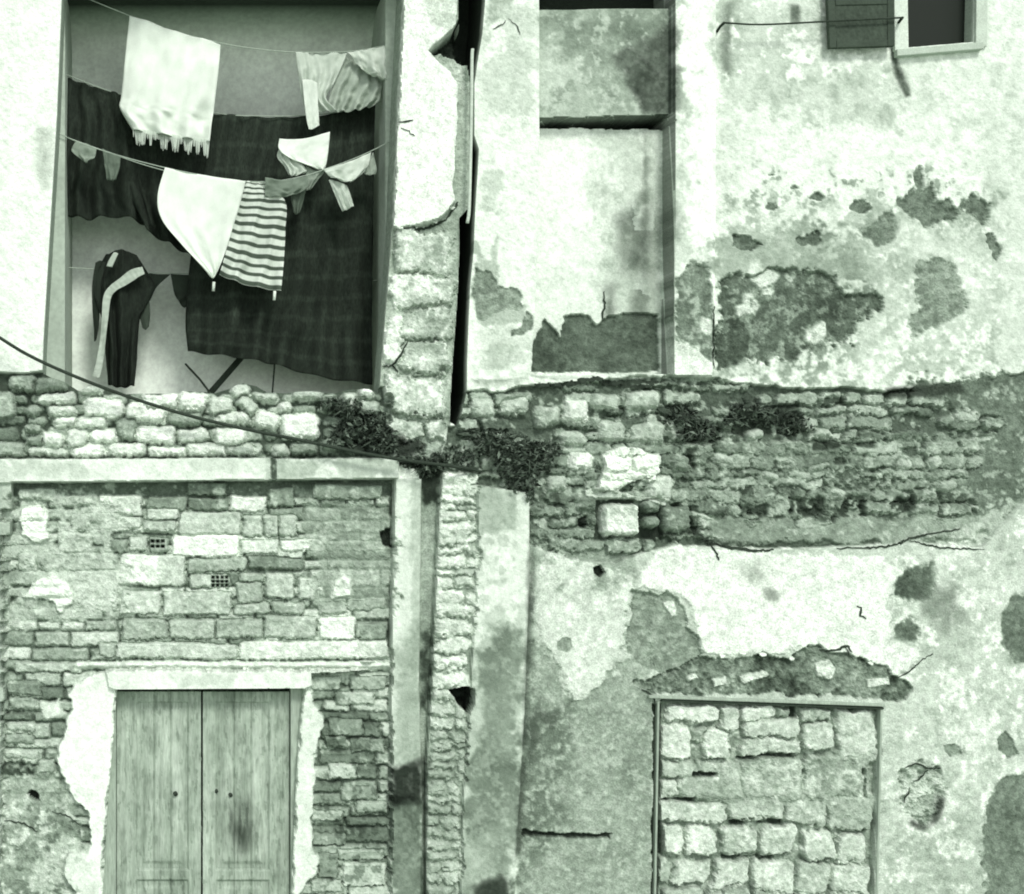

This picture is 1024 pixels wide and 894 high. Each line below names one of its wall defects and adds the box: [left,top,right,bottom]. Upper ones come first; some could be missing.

damp [620,36,676,112]
flaking render [849,166,1002,261]
crack [599,291,607,322]
flaking render [472,261,884,377]
flaking render [908,256,969,338]
crack [696,532,774,560]
crack [837,529,985,550]
flaking render [626,589,914,703]